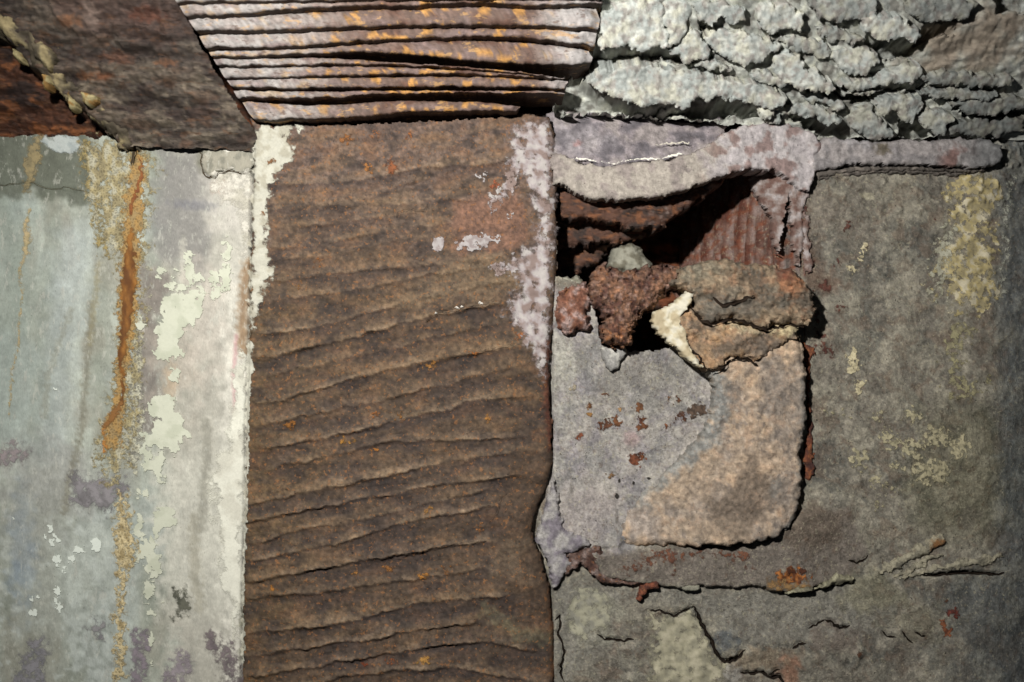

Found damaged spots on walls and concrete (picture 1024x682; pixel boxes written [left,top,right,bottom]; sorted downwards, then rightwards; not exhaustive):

water stain [487,118,557,378]
rust [555,177,727,278]
rust [77,132,164,488]
peeling [649,291,704,368]
peeling [132,236,233,616]
rust [586,399,648,431]
rust [629,452,647,468]
rust [664,395,707,429]
crack [923,569,1004,577]
crack [597,634,634,642]
crack [651,606,784,682]
crack [793,619,850,648]